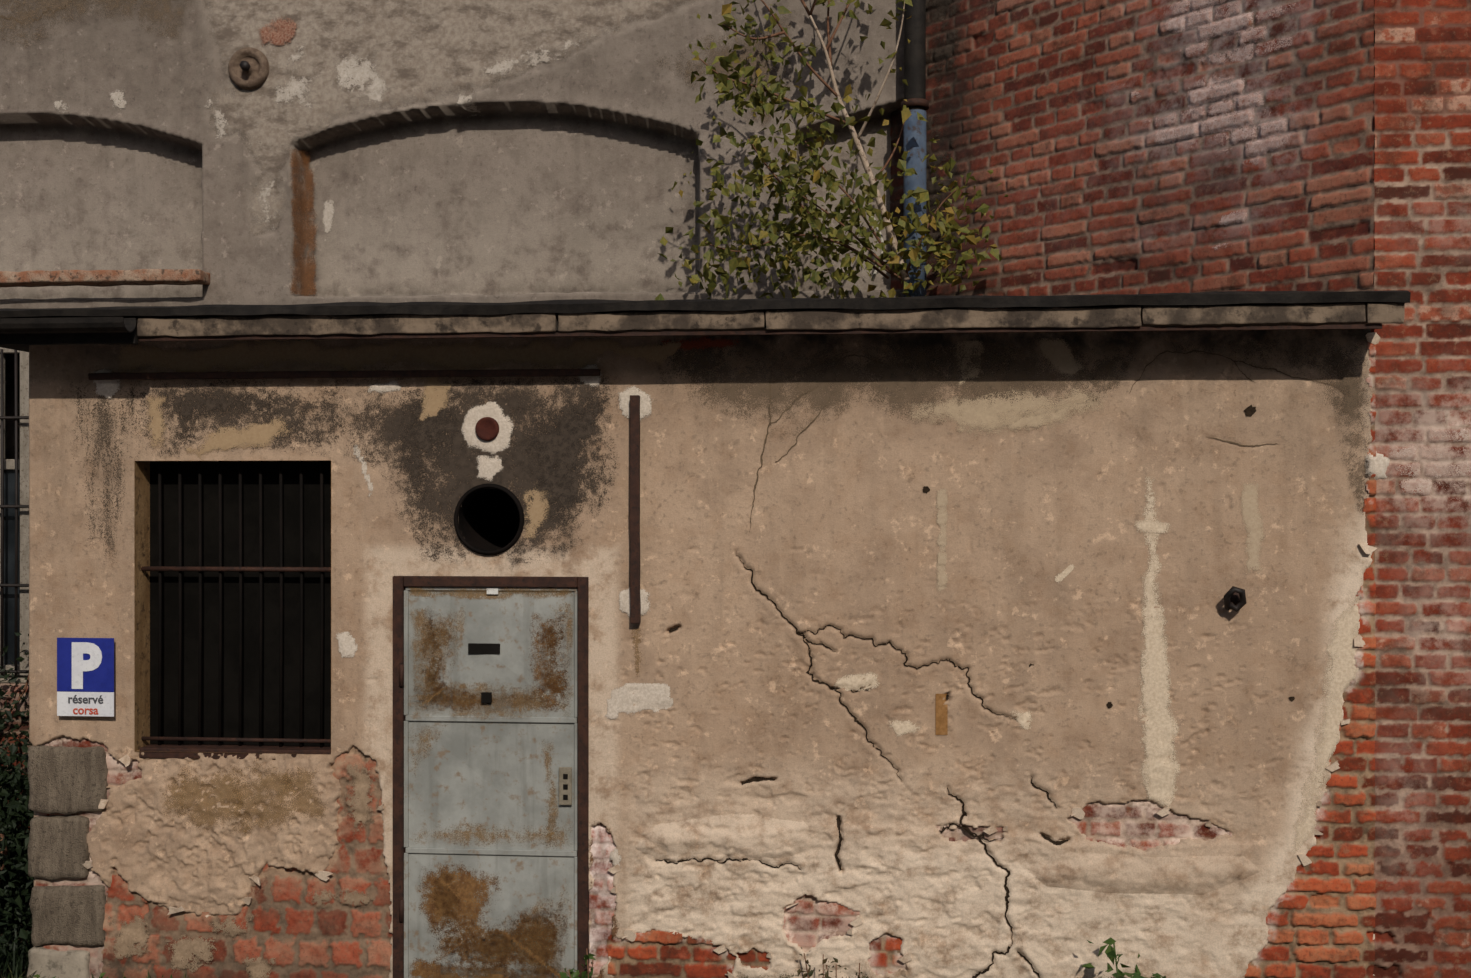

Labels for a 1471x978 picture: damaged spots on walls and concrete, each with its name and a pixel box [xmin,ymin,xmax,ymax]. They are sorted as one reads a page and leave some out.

corrosion [289,147,320,296]
water stain [656,336,1135,435]
water stain [1155,333,1372,515]
crack [740,351,1017,779]
water stain [1134,476,1180,809]
spalling [1245,332,1380,978]
spalling [27,736,393,978]
spalling [589,823,772,978]
spalling [783,894,863,952]
crack [939,787,1040,978]
crack [1031,776,1057,808]
spalling [1041,800,1232,851]